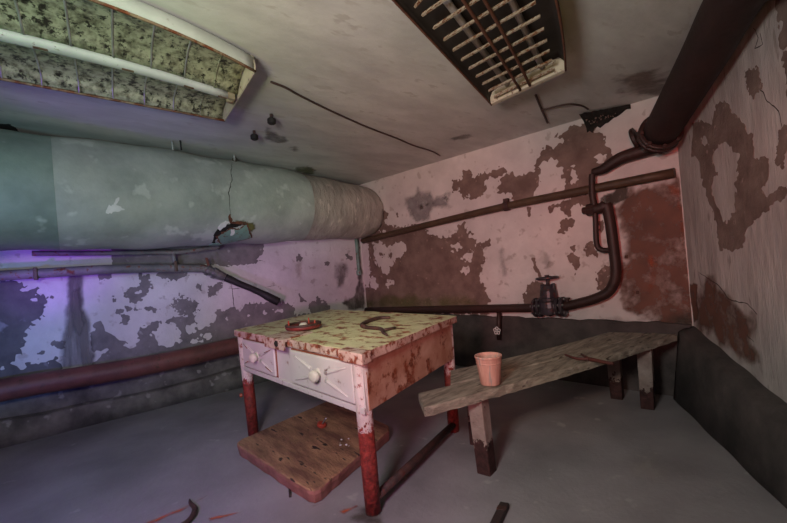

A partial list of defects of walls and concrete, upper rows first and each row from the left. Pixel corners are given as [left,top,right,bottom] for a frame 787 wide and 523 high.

peeling [745,65,763,100]
peeling [775,0,787,96]
peeling [452,104,631,234]
peeling [691,101,787,252]
peeling [0,280,64,379]
leakage [63,275,94,368]
peeling [363,210,491,315]
peeling [522,258,543,304]
peeling [567,241,598,275]
peeling [595,265,610,290]